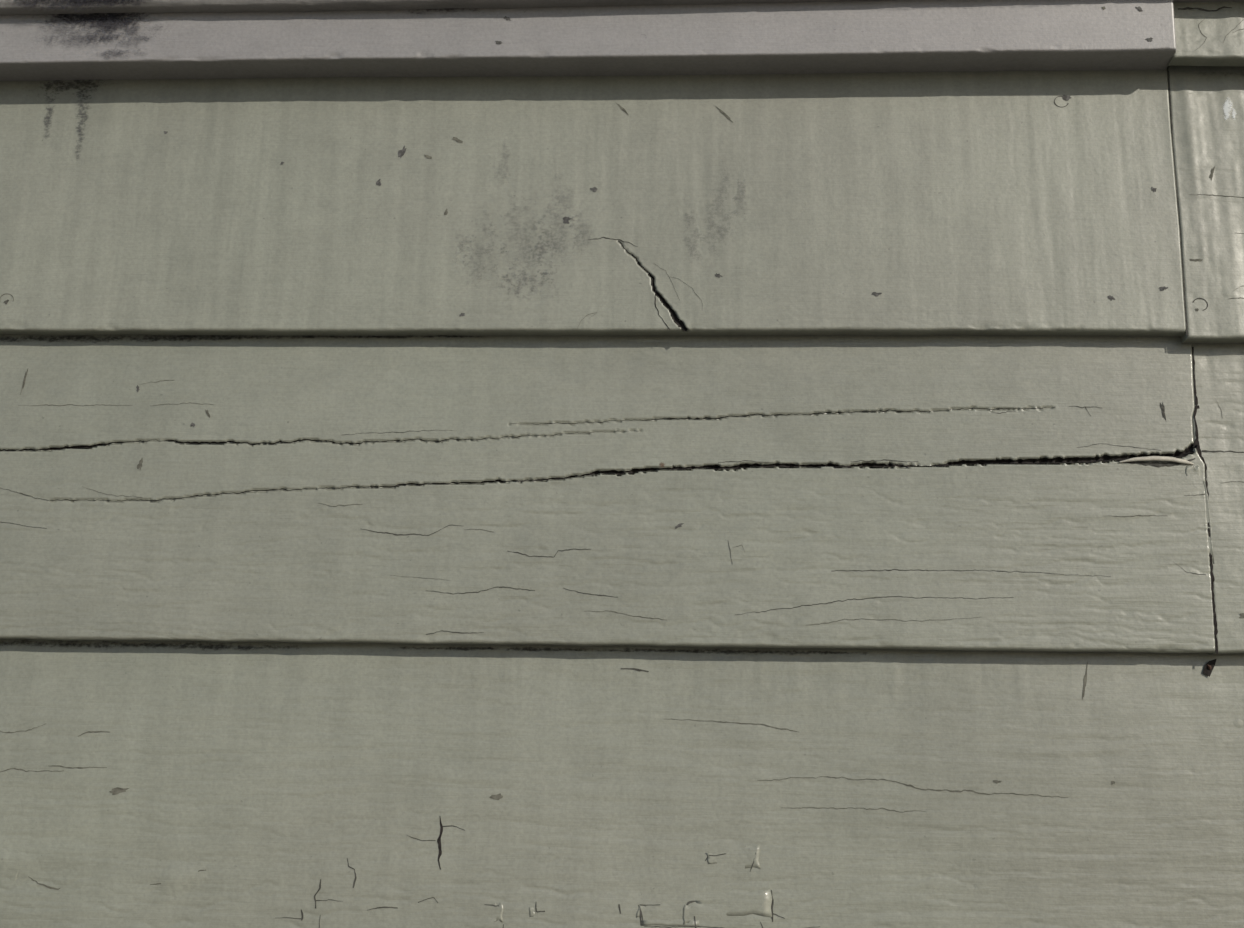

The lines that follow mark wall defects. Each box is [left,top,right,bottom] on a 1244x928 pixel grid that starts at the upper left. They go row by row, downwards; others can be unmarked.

damp [13,0,144,55]
crack [0,71,1244,654]